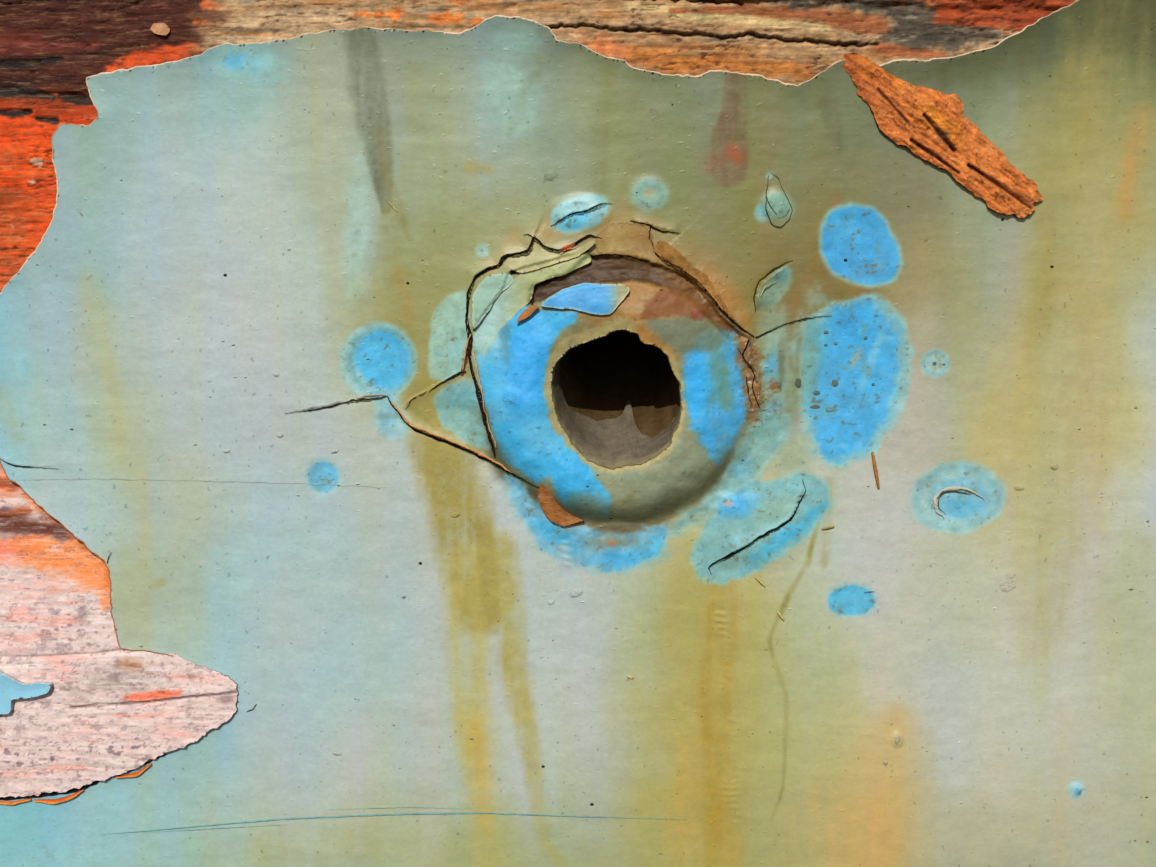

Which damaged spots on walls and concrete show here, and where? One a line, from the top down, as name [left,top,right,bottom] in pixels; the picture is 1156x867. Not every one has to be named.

peeling [0,461,239,805]
peeling [335,132,381,335]
rust [400,364,555,823]
peeling [424,241,630,454]
peeling [0,0,1079,294]
crack [285,203,827,488]
rust [538,484,583,526]
peeling [499,286,838,578]
crack [708,479,806,573]
crack [765,173,793,228]